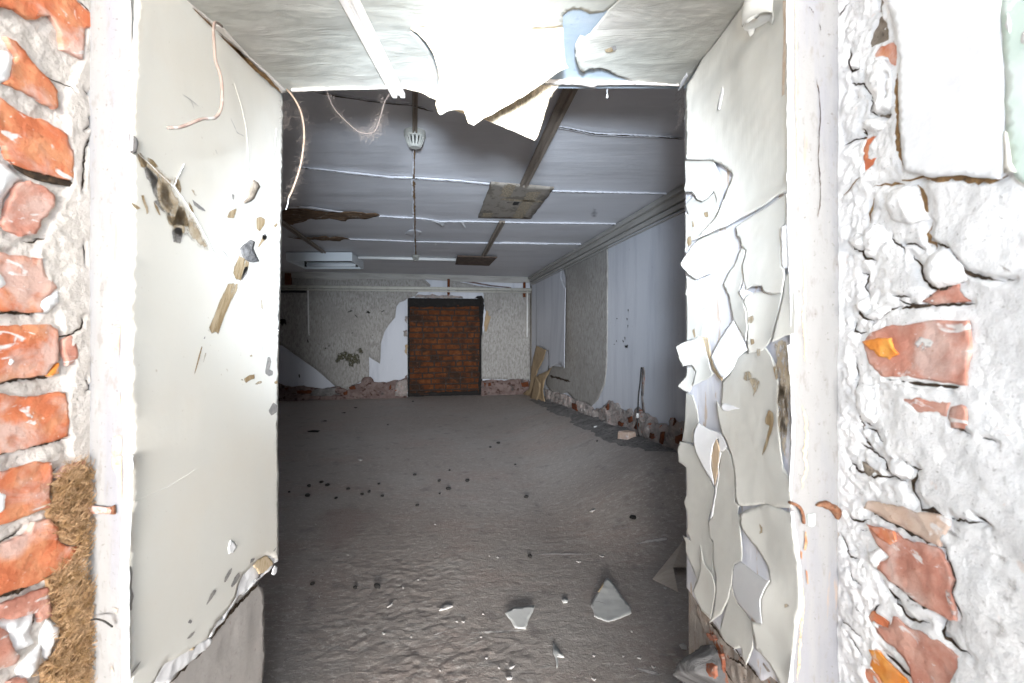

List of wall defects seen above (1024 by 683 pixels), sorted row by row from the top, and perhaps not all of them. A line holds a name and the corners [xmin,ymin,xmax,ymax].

flaking render [0,36,74,237]
flaking render [0,0,91,59]
leakage [137,153,207,247]
spalling [871,0,1008,185]
flaking render [0,252,78,454]
spalling [278,375,408,401]
peeling [401,0,809,683]
flaking render [862,320,973,386]
flaking render [0,460,85,683]
spalling [154,547,278,683]
flaking render [864,501,958,621]
flaking render [865,611,959,683]